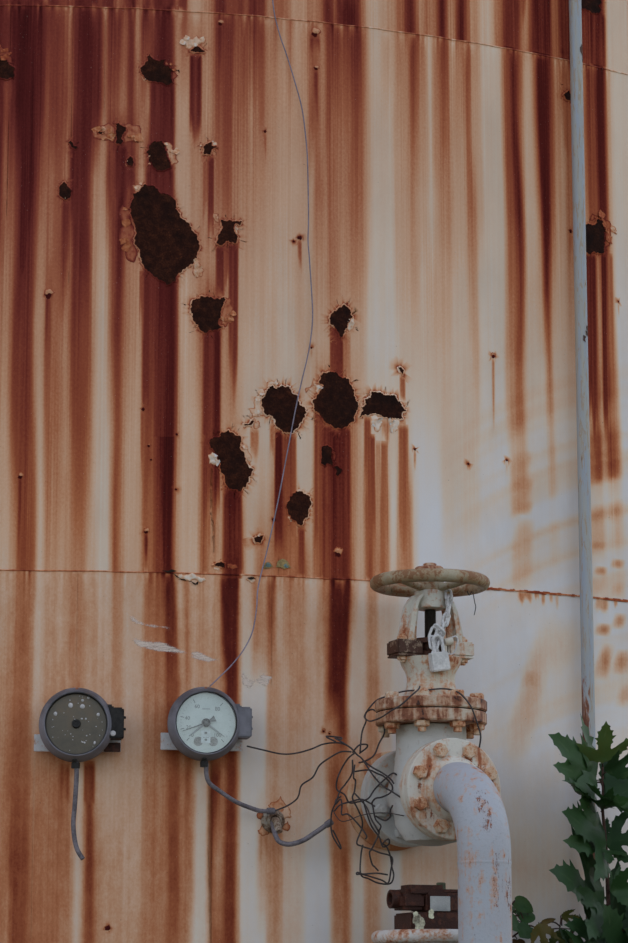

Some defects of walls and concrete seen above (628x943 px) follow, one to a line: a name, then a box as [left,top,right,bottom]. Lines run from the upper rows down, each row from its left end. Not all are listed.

corrosion [211,0,285,218]
corrosion [309,0,365,233]
corrosion [497,0,570,424]
corrosion [580,44,610,223]
corrosion [0,0,179,943]
corrosion [591,387,618,484]
corrosion [207,492,354,943]